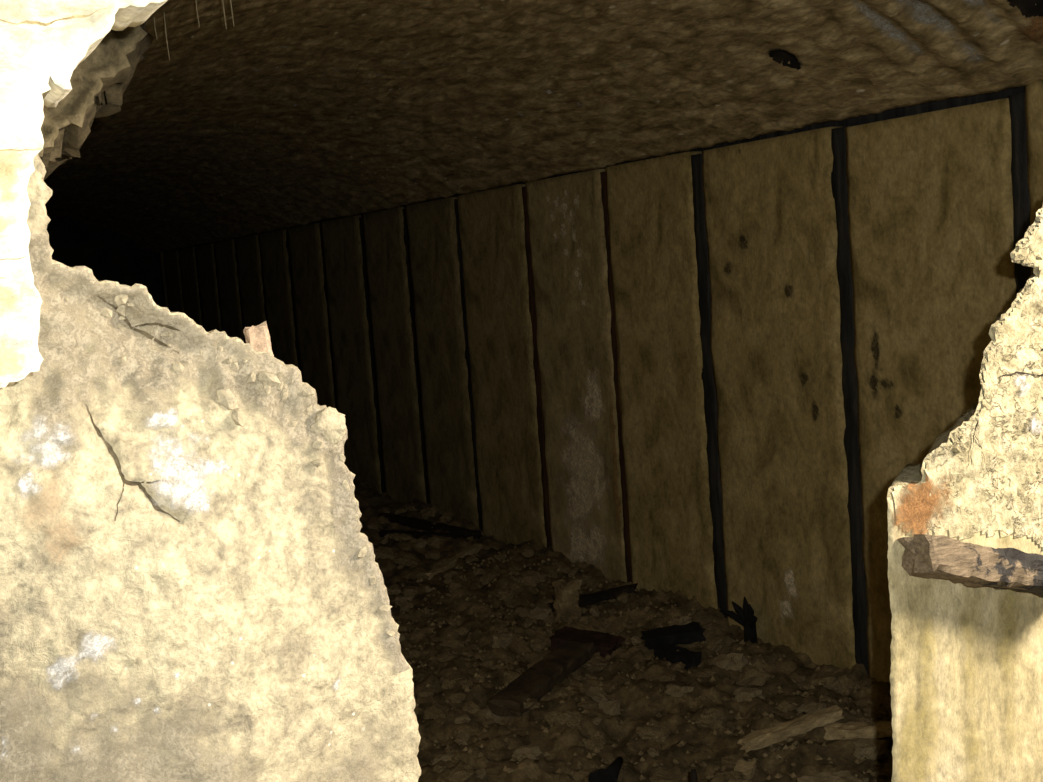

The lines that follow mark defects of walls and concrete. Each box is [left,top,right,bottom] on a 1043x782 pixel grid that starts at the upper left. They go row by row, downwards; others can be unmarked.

crack [0,8,107,26]
spalling [892,211,1043,547]
crack [1000,348,1043,377]
leakage [18,422,70,493]
crack [85,404,180,522]
leakage [148,409,230,511]
spalling [28,234,410,673]
corrosion [895,478,948,534]
leakage [0,633,255,782]